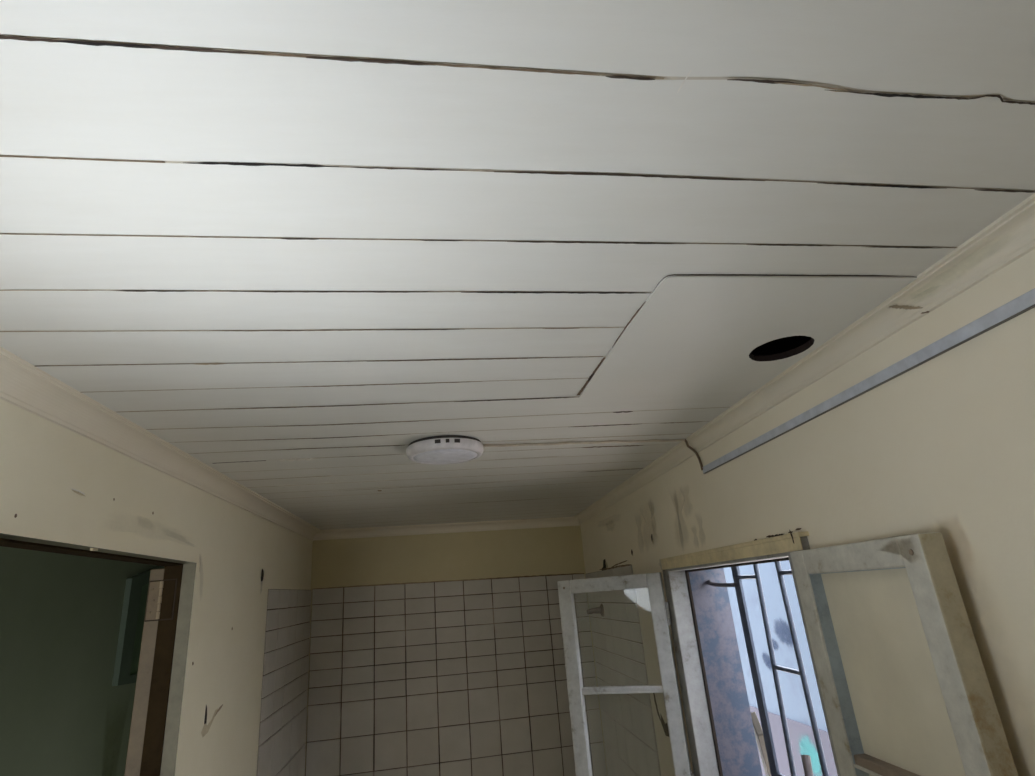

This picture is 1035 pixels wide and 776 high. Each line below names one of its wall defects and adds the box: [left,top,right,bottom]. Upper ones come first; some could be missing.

crack [0,36,664,80]
crack [727,79,1035,105]
crack [0,155,1035,193]
crack [0,327,104,335]
crack [210,325,619,333]
crack [35,357,705,491]